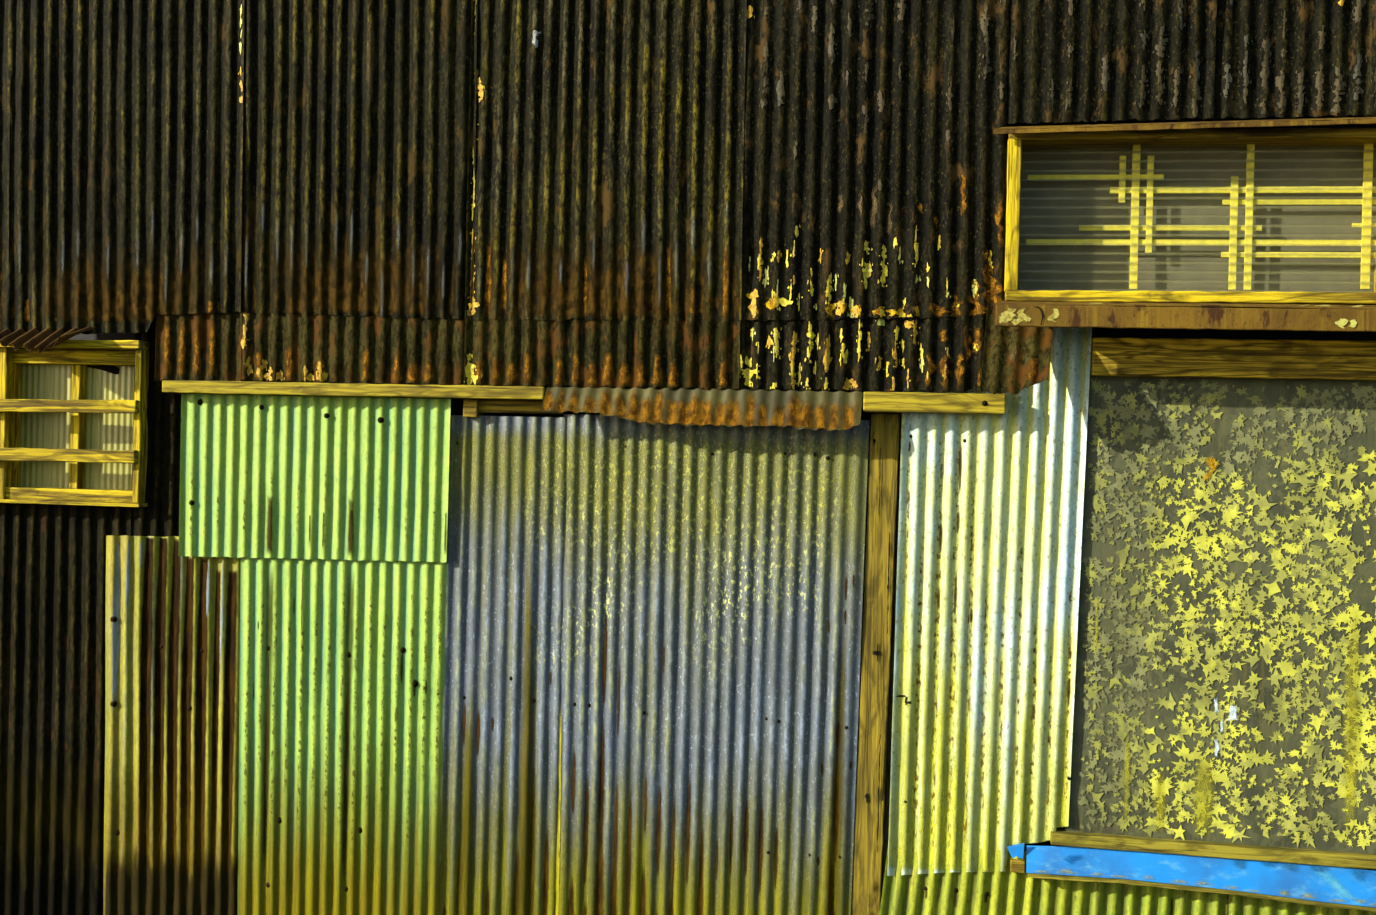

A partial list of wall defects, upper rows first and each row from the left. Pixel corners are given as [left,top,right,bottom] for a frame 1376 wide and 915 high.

rust [838,194,892,231]
rust [46,247,855,429]
peeling [739,224,948,390]
rust [826,205,1004,386]
rust [138,474,442,875]
rust [443,851,462,915]
rust [462,704,493,755]
rust [513,784,548,915]
rust [568,616,778,915]
rust [817,761,852,915]
rust [828,575,854,634]